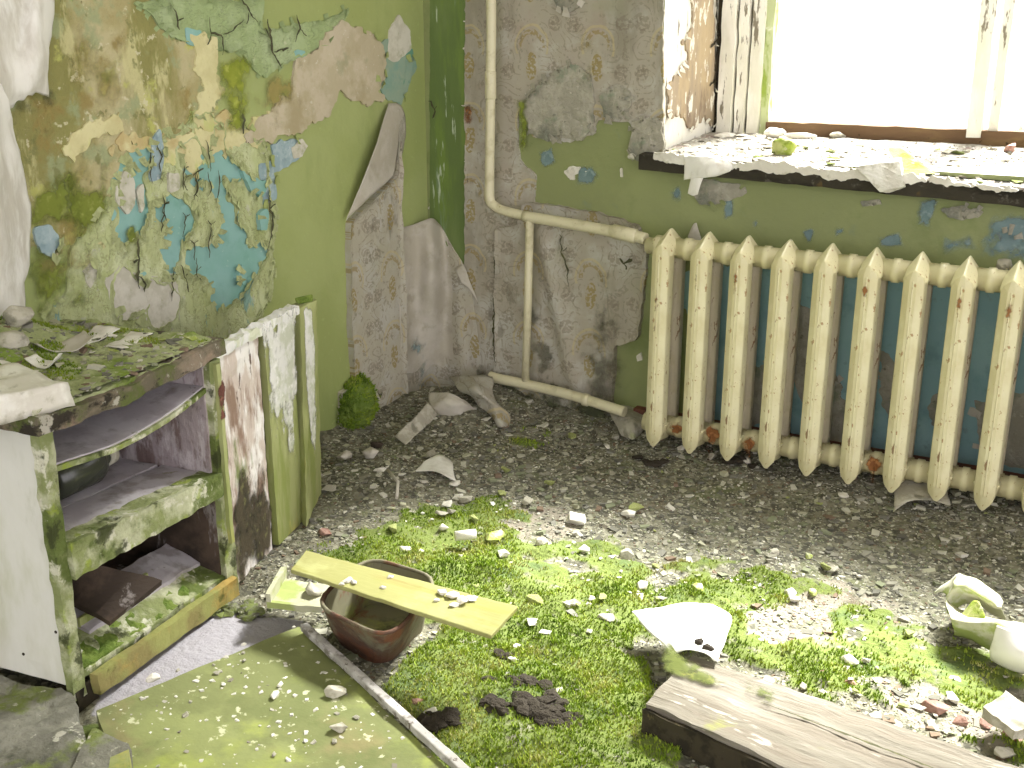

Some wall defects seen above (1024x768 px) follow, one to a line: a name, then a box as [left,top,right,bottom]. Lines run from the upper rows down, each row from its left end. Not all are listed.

crack [207,0,307,68]
spalling [523,0,718,166]
crack [133,141,224,296]
flaking render [10,0,417,357]
crack [268,190,276,248]
peeling [752,269,771,428]
flaking render [790,273,813,435]
peeling [830,276,857,442]
peeling [871,281,903,450]
peeling [913,286,951,457]
peeling [958,291,1000,465]
flaking render [1003,330,1024,474]